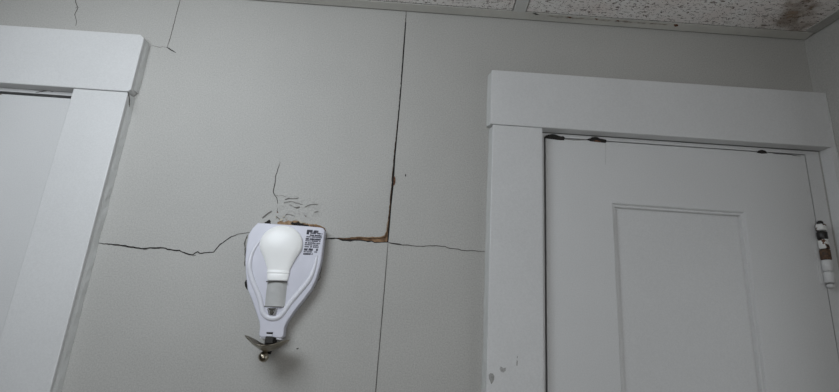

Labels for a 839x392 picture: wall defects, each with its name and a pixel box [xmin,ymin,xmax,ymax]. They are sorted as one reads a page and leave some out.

crack [100,232,250,256]
crack [327,18,484,392]